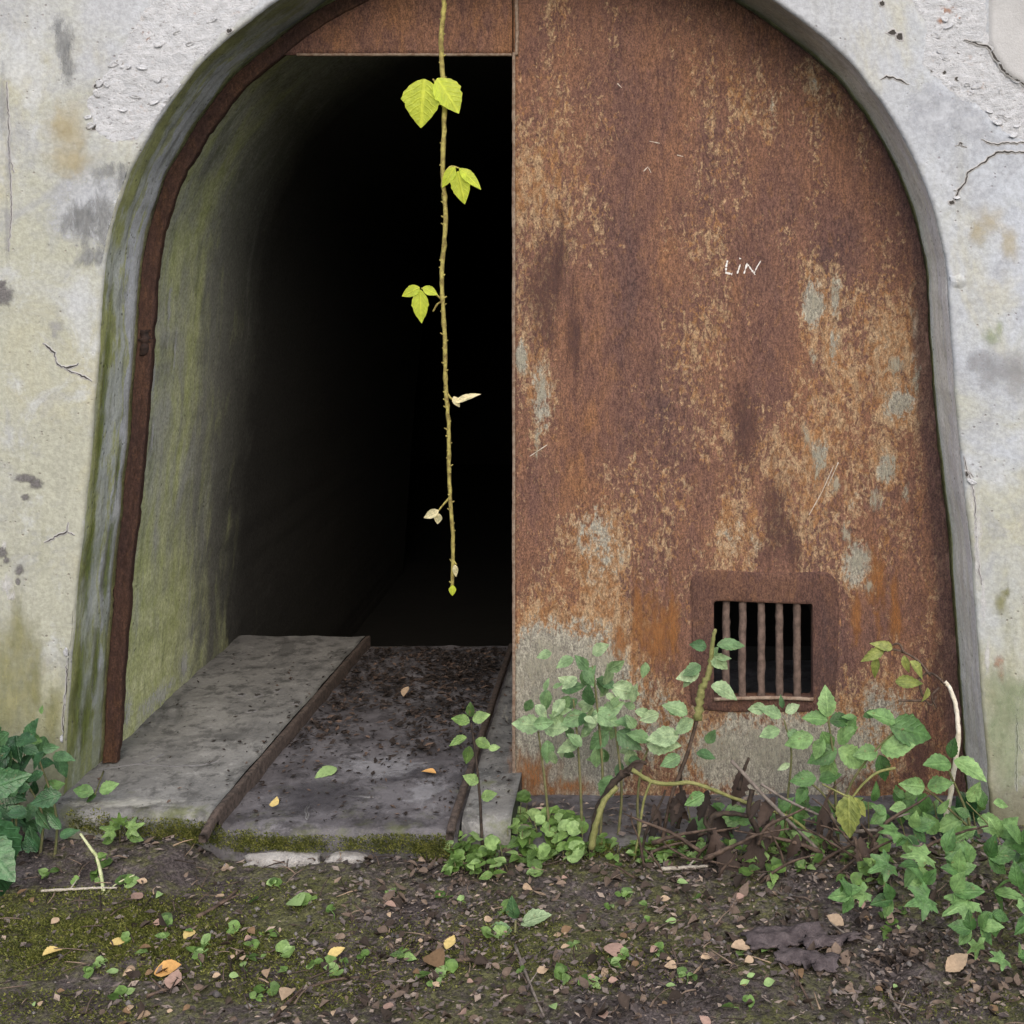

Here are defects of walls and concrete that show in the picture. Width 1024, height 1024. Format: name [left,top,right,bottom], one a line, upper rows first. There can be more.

leakage [55,20,72,75]
flaking render [83,0,259,143]
flaking render [913,0,1024,141]
crack [953,139,1024,201]
leakage [51,163,127,264]
crack [43,343,92,382]
leakage [16,474,42,500]
leakage [85,520,95,604]
leakage [74,631,100,750]
rust [517,752,585,796]
rust [914,741,931,773]